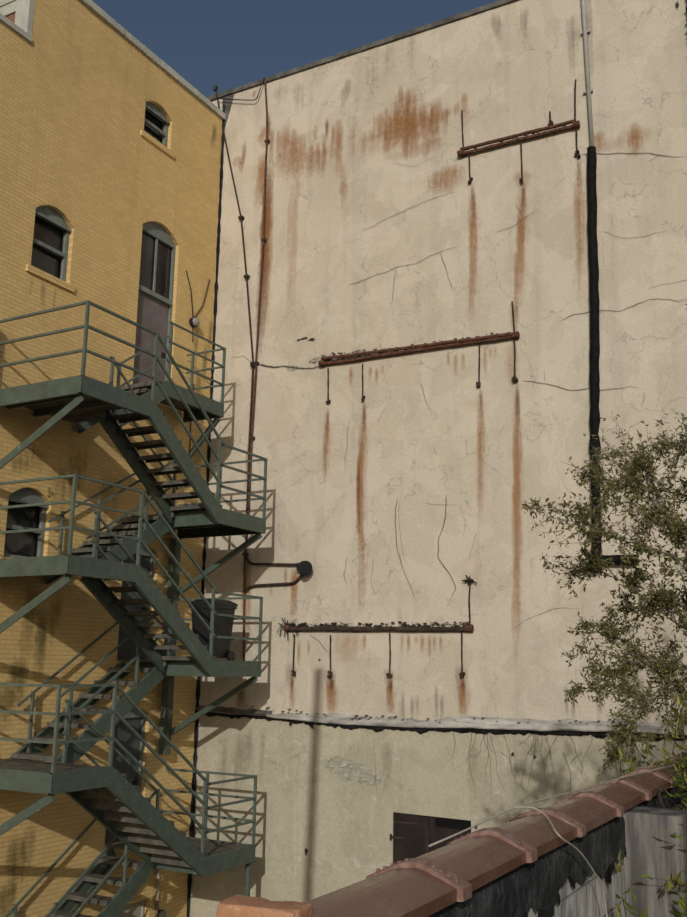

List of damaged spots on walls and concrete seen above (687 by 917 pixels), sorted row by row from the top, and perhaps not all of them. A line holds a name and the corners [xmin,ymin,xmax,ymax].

rust [260,197,270,287]